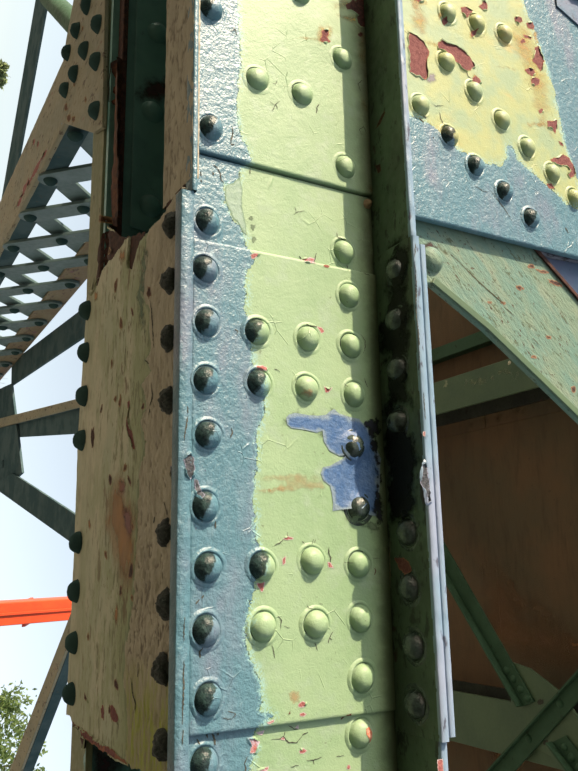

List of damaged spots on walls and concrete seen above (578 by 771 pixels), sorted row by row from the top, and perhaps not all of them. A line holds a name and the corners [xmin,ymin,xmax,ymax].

rust [346,0,365,37]
rust [139,81,165,101]
rust [88,57,145,299]
rust [72,722,128,771]
peeling [246,720,274,755]